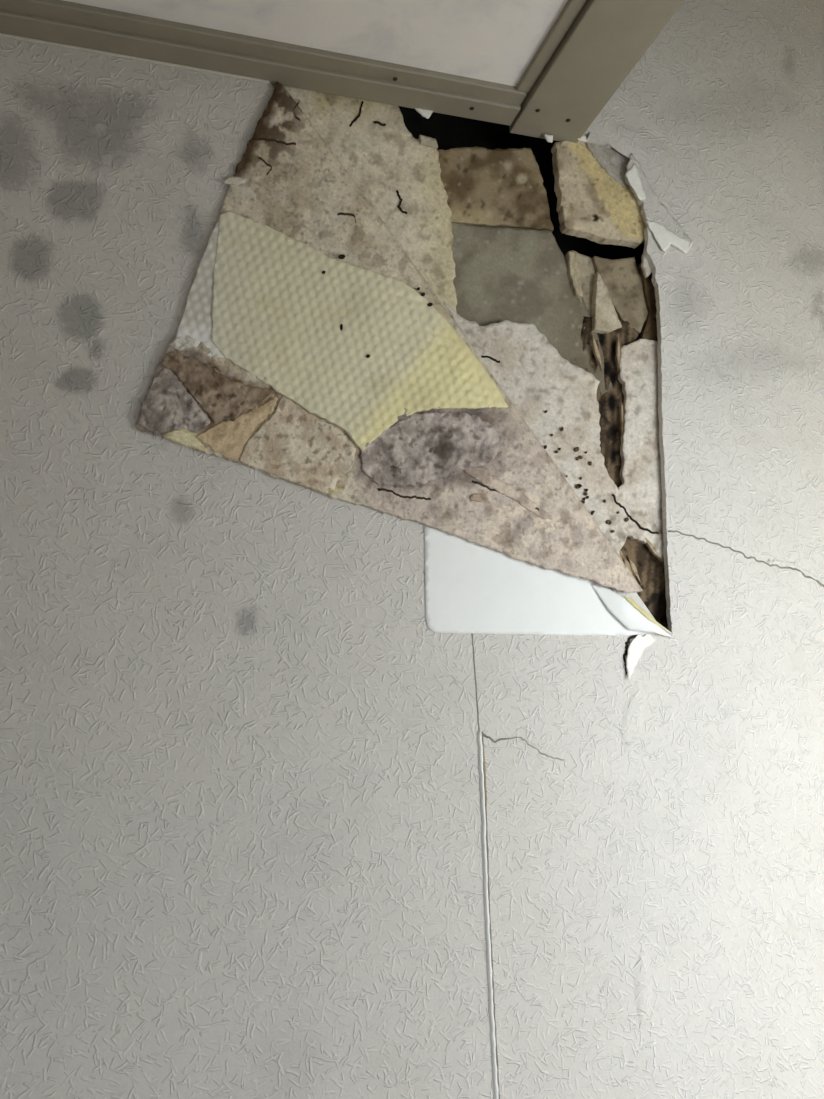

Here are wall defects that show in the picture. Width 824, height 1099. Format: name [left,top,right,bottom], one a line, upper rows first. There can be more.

peeling [136,82,668,629]
crack [668,530,824,587]
crack [482,733,565,761]